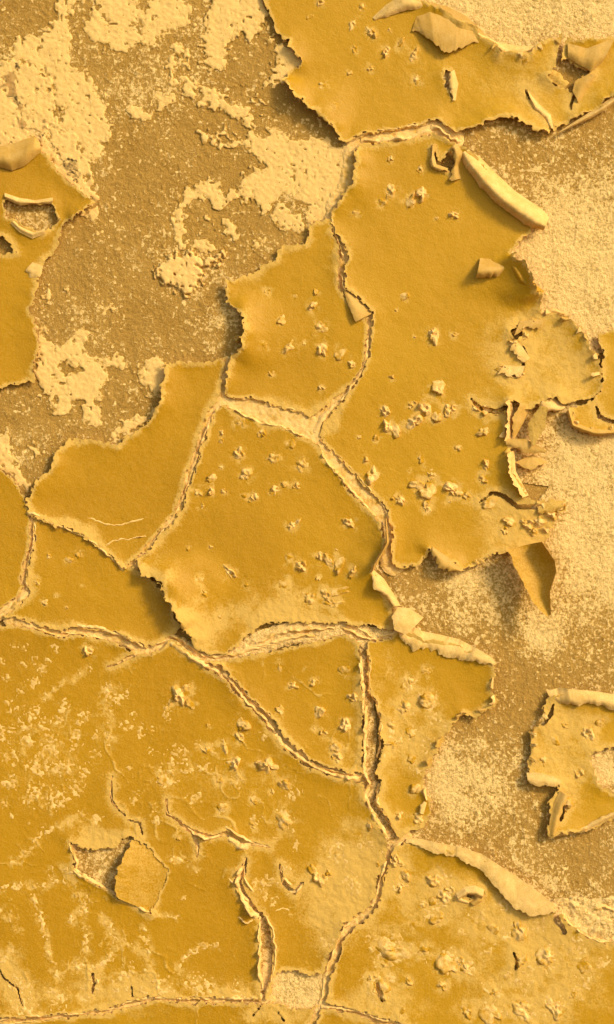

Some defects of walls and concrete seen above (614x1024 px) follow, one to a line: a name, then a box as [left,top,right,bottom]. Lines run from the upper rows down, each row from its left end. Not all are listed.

peeling [0,0,355,502]
peeling [349,0,614,379]
peeling [102,682,303,907]
peeling [194,466,228,509]
crack [0,119,464,1024]
peeling [278,663,319,689]
peeling [311,706,351,763]
peeling [307,822,410,895]
peeling [357,380,457,442]
peeling [358,397,614,1024]